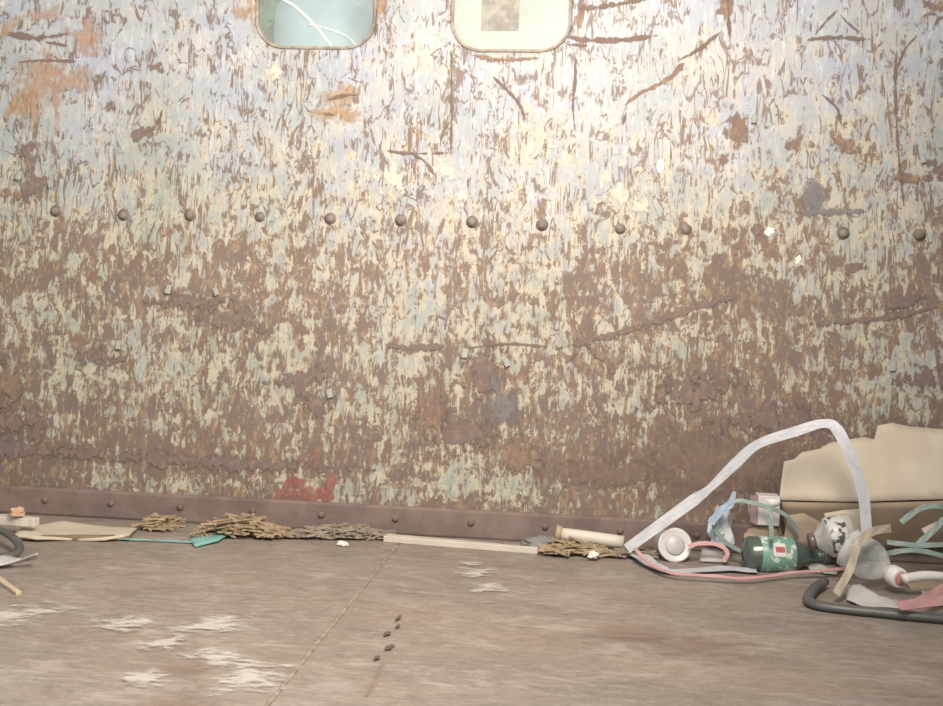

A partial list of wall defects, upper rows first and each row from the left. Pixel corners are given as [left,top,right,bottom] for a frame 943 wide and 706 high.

corrosion [576,0,585,28]
corrosion [5,19,100,130]
peeling [622,0,734,125]
peeling [0,141,53,204]
peeling [131,111,162,143]
corrosion [314,86,357,122]
peeling [719,112,759,166]
peeling [785,134,804,152]
peeling [894,154,943,184]
peeling [751,223,774,237]
corrosion [406,370,451,446]
corrosion [534,367,837,499]